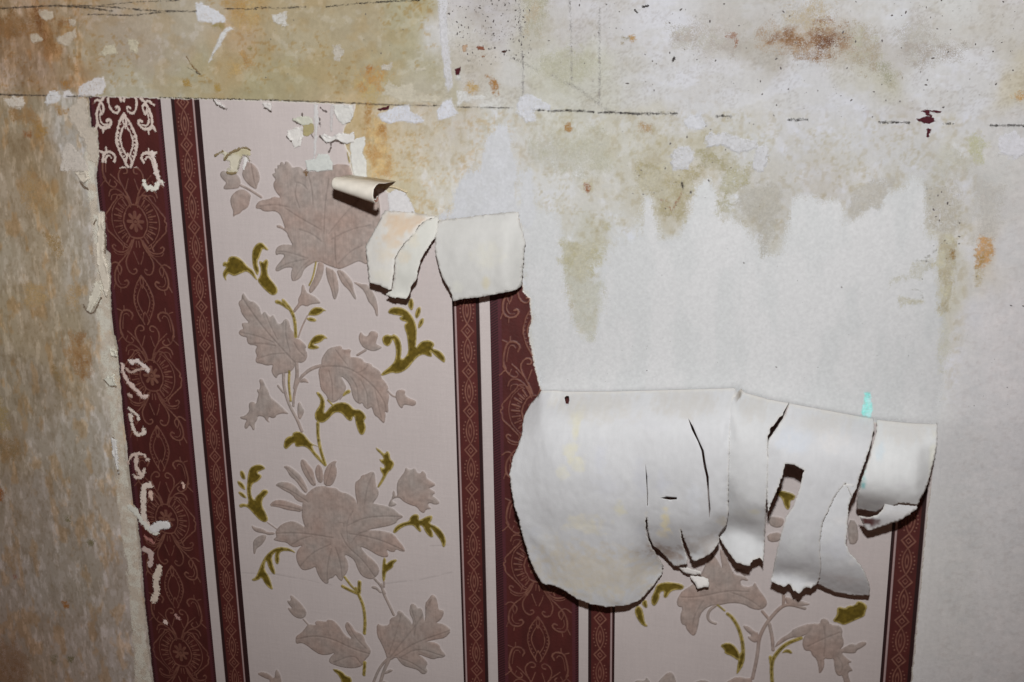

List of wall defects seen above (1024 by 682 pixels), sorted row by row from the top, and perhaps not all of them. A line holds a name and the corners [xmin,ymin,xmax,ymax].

rust [754,0,859,69]
peeling [83,212,111,314]
damp [715,161,788,259]
damp [921,131,992,375]
rust [967,172,1008,288]
peeling [111,437,120,475]